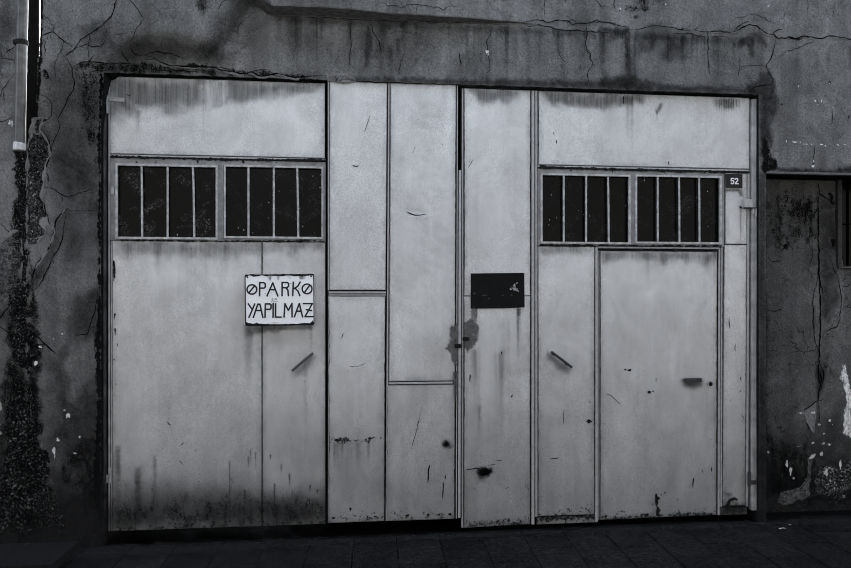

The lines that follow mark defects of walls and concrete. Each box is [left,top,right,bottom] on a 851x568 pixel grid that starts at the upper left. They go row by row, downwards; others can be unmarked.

water stain [0,201,47,470]
spalling [0,390,64,536]
crack [0,0,506,337]
crack [526,0,851,122]
crack [766,147,851,429]
peeling [778,404,851,505]